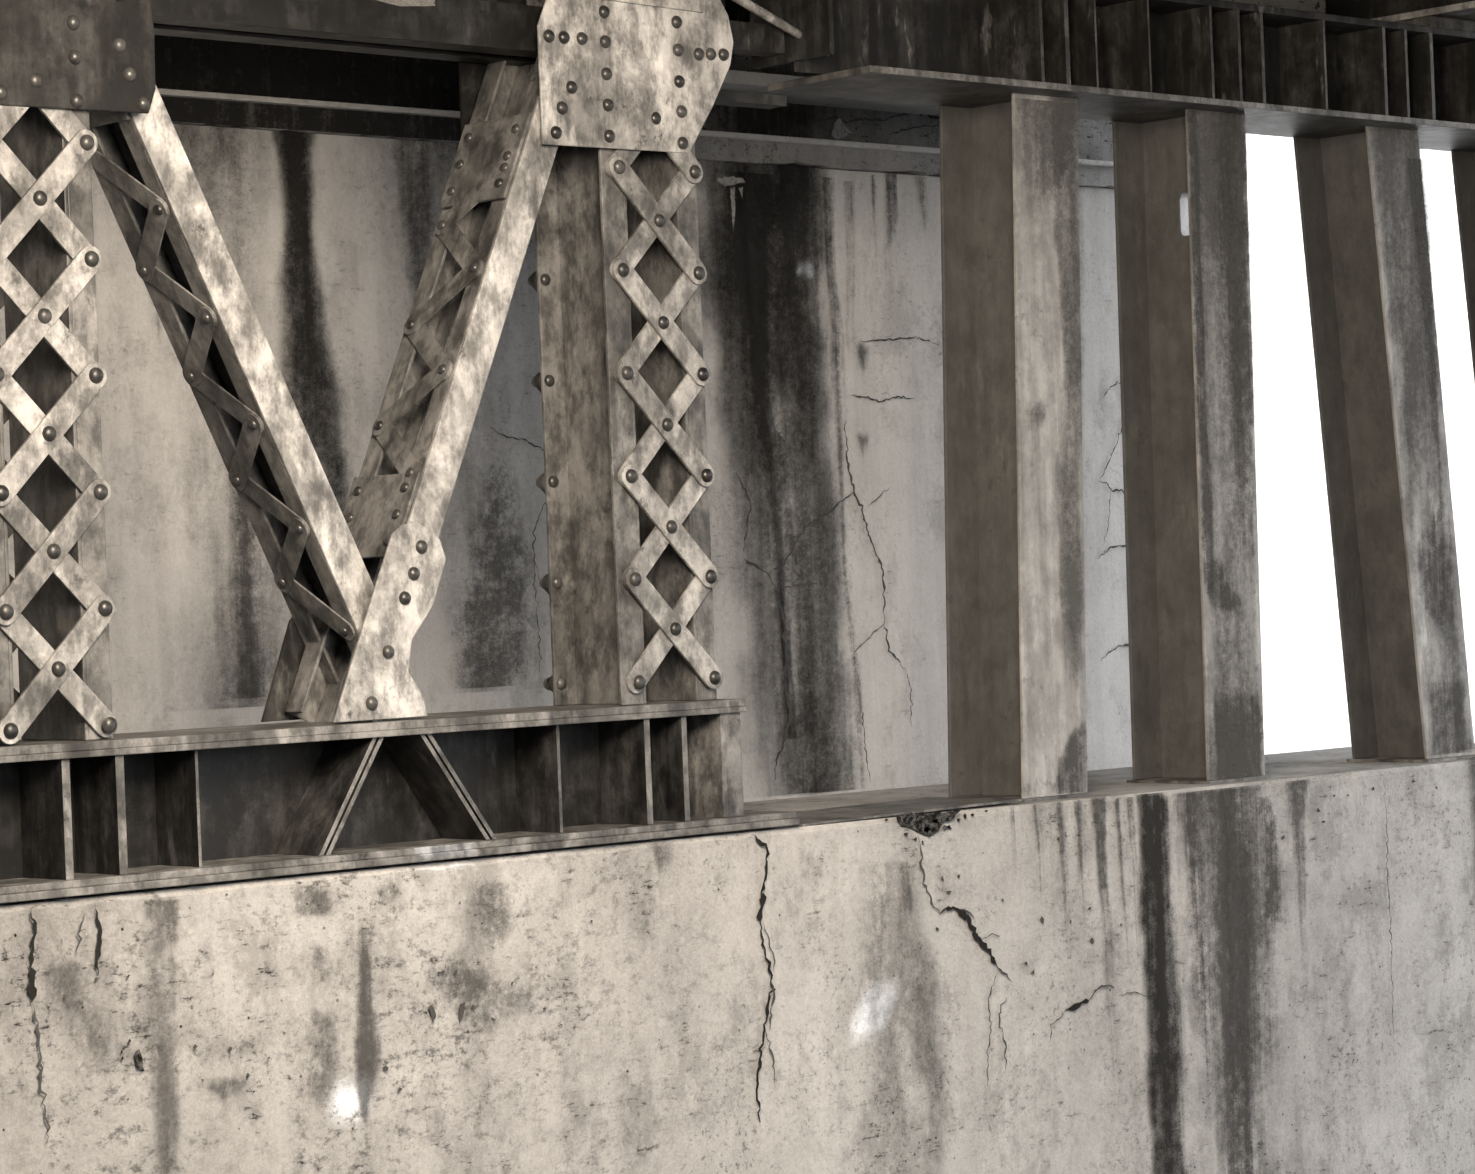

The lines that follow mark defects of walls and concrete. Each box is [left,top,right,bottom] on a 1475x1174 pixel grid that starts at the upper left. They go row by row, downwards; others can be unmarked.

leakage [699,161,867,794]
crack [736,395,914,780]
crack [24,913,51,1144]
crack [76,908,102,976]
leakage [156,981,178,1174]
leakage [356,940,380,1118]
crack [751,834,776,1122]
spalling [884,809,988,845]
crack [918,838,1012,1086]
crack [1050,985,1145,1039]
leakage [1057,785,1280,1174]
leakage [1289,780,1307,897]